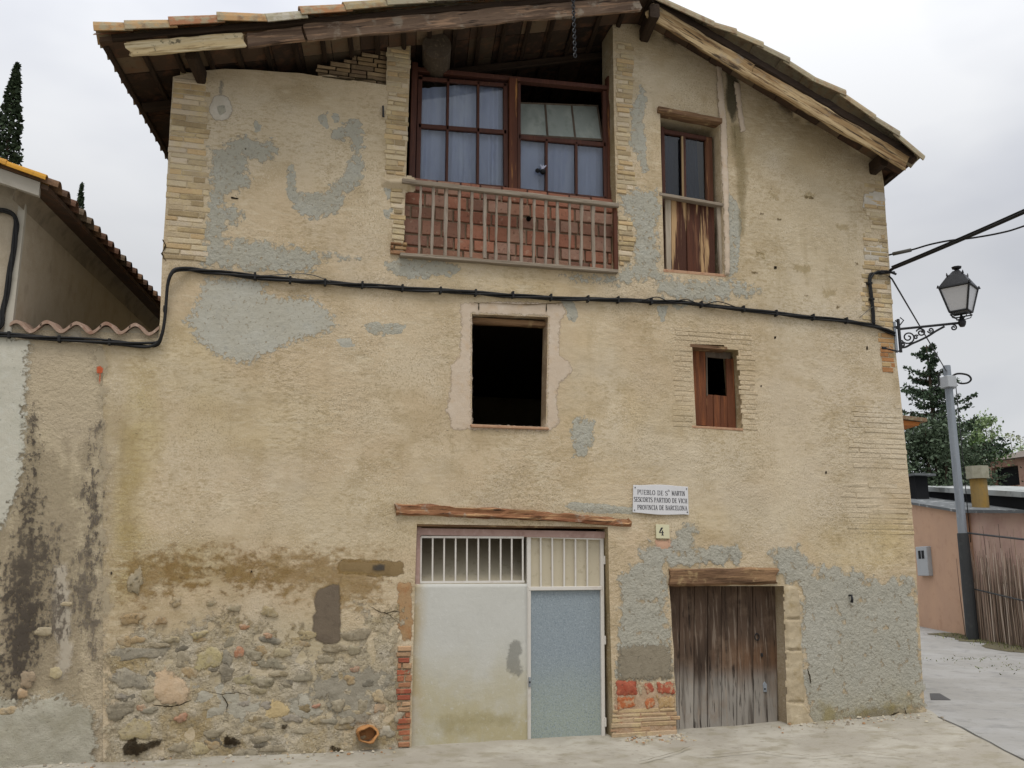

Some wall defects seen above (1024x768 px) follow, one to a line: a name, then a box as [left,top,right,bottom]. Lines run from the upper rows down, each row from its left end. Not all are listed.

damp [0,402,112,700]